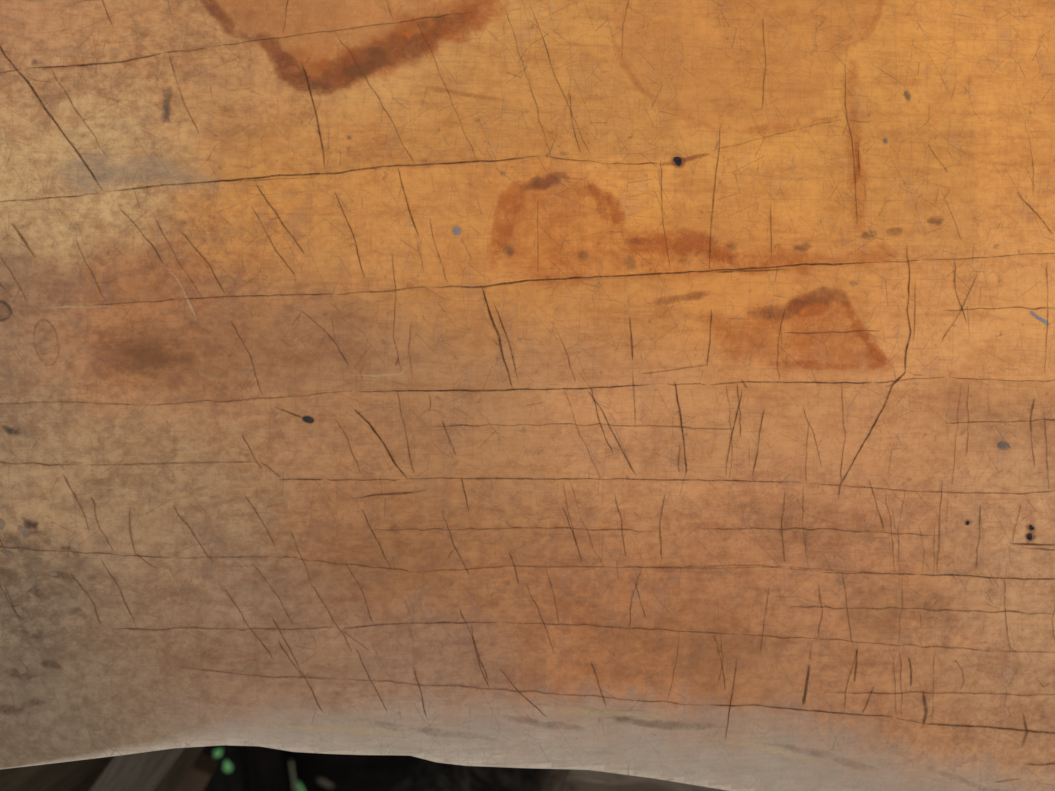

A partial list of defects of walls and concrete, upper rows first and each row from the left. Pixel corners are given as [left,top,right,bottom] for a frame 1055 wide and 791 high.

water stain [258,3,493,93]
crack [943,253,1048,345]
crack [242,244,856,571]
crack [603,314,856,634]
crack [777,260,916,494]
crack [950,378,1055,494]
crack [0,519,212,631]
crack [245,590,387,711]
crack [716,517,1055,734]